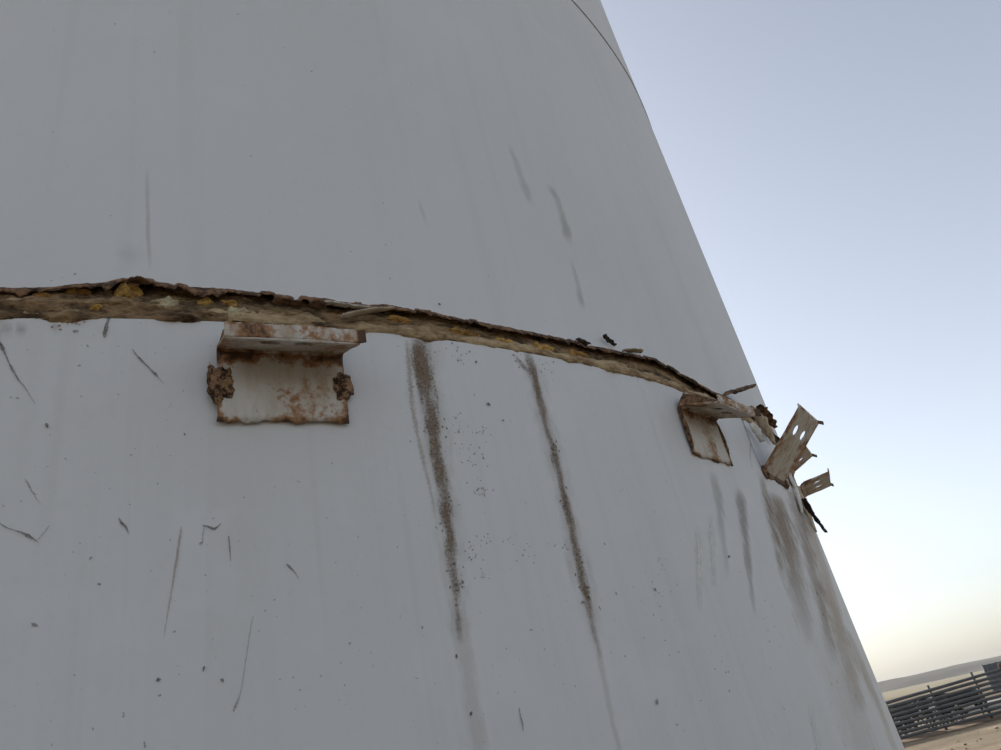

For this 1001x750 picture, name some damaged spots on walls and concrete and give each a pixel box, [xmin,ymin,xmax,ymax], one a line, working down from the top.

peeling [126,275,150,285]
peeling [273,295,395,319]
peeling [603,334,644,353]
peeling [723,384,756,396]
peeling [749,404,778,444]
peeling [789,473,828,533]